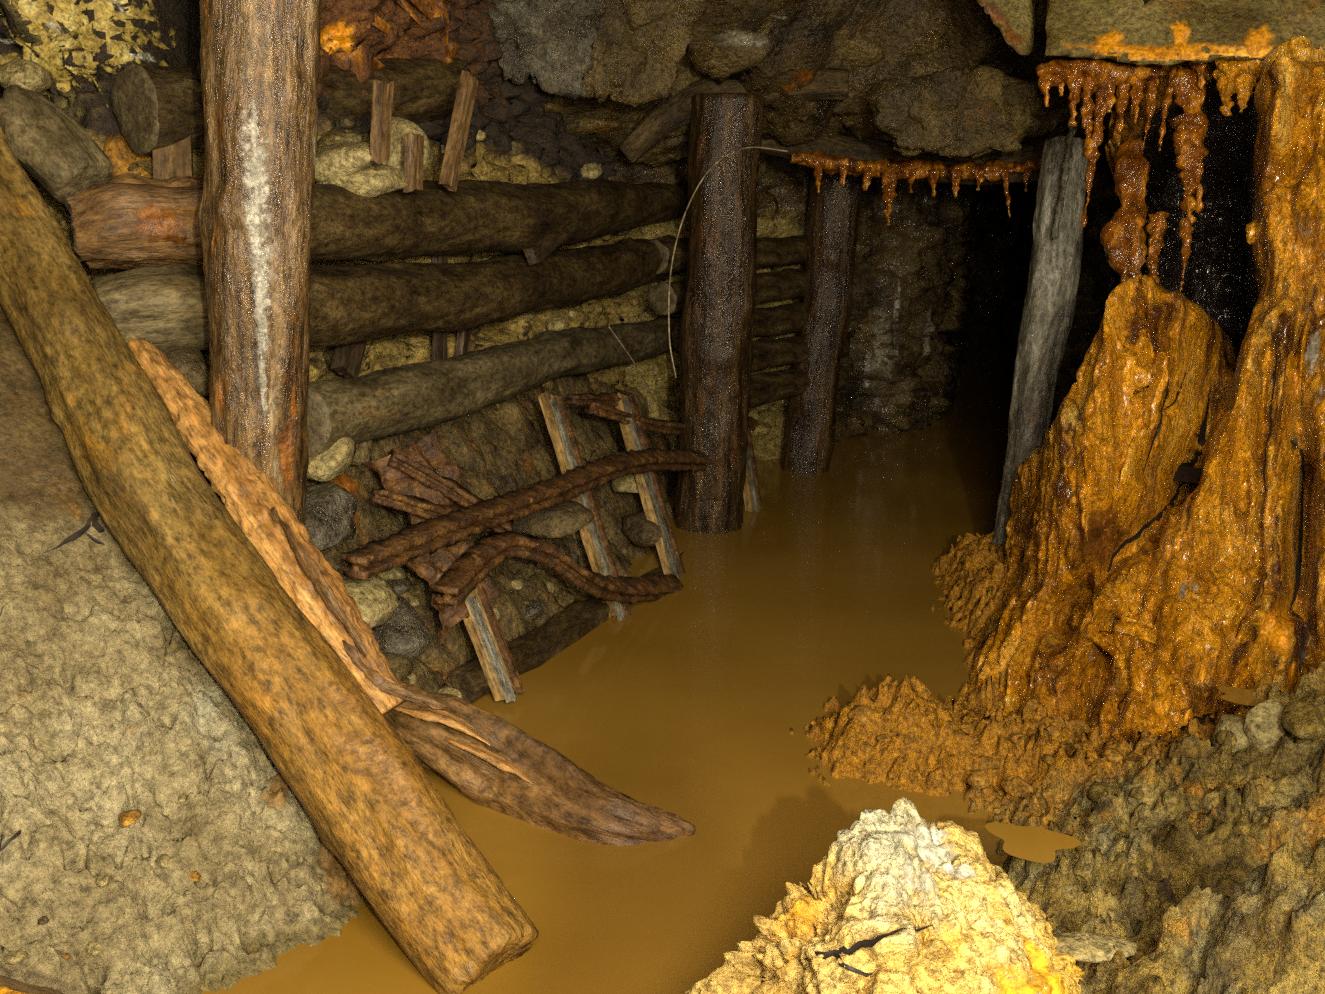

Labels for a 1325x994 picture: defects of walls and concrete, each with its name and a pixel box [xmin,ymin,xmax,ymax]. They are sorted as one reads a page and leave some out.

efflorescence [240,99,273,425]
rust [789,151,1041,226]
rust [1036,21,1275,291]